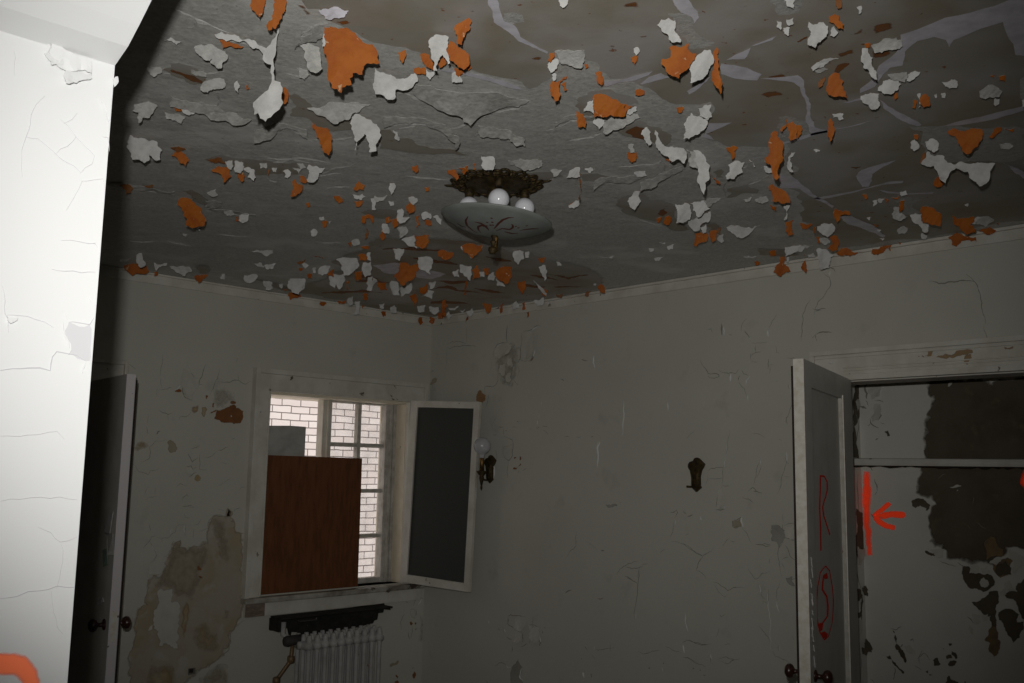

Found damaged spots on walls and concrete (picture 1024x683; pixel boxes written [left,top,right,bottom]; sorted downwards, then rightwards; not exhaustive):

flaking render [107,0,1024,325]
crack [0,286,94,371]
flaking render [128,508,244,683]
flaking render [211,401,243,424]
crack [700,272,832,502]
flaking render [911,376,1024,656]